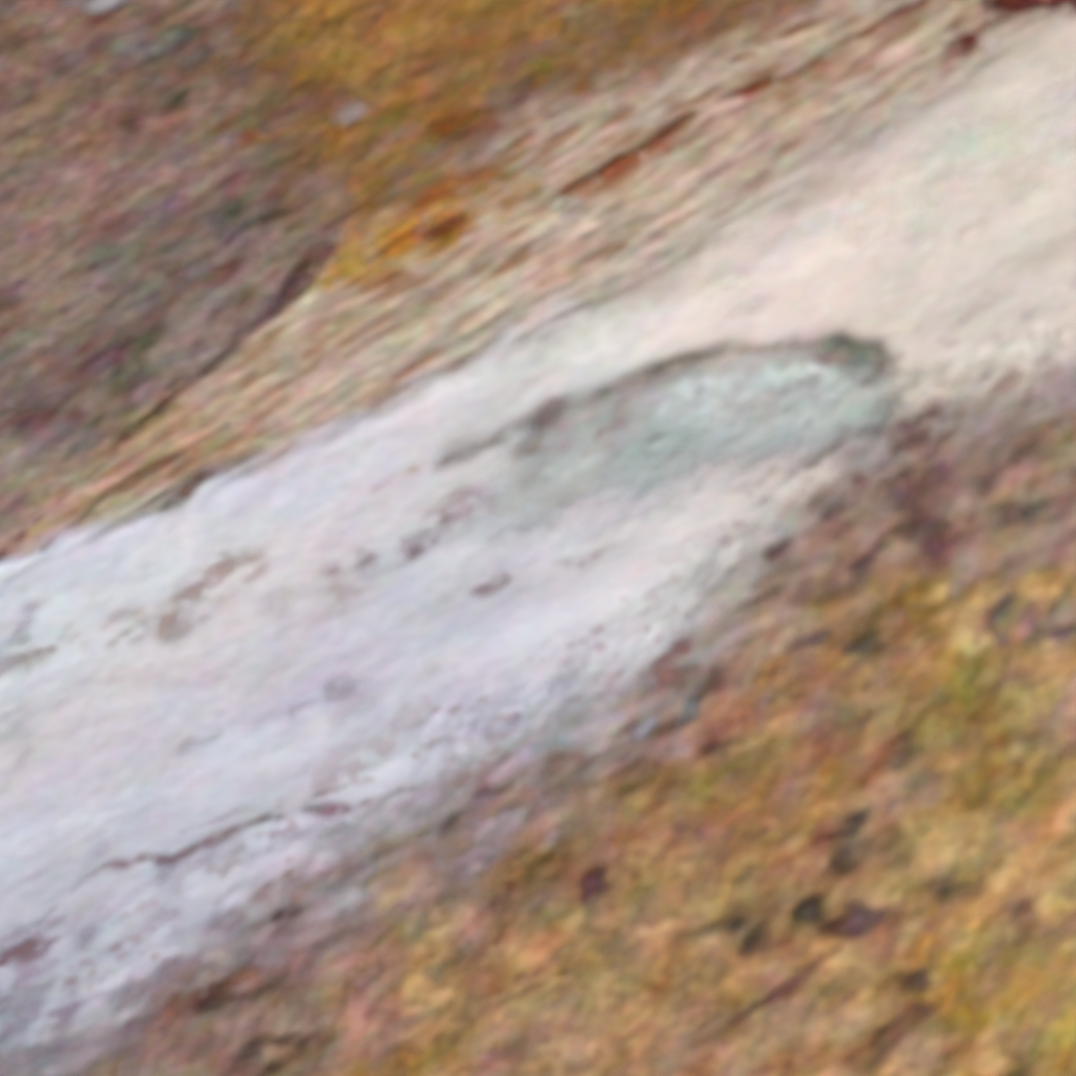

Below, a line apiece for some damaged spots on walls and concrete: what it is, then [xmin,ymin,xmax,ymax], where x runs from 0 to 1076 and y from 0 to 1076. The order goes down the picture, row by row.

damp [1034,78,1076,103]
damp [902,102,1076,205]
damp [800,185,877,234]
damp [904,209,921,222]
damp [710,271,742,286]
damp [208,559,235,577]
damp [177,582,205,599]
damp [476,585,495,594]
damp [0,658,16,673]
damp [458,810,524,878]
damp [13,952,43,1021]
damp [119,982,141,1006]